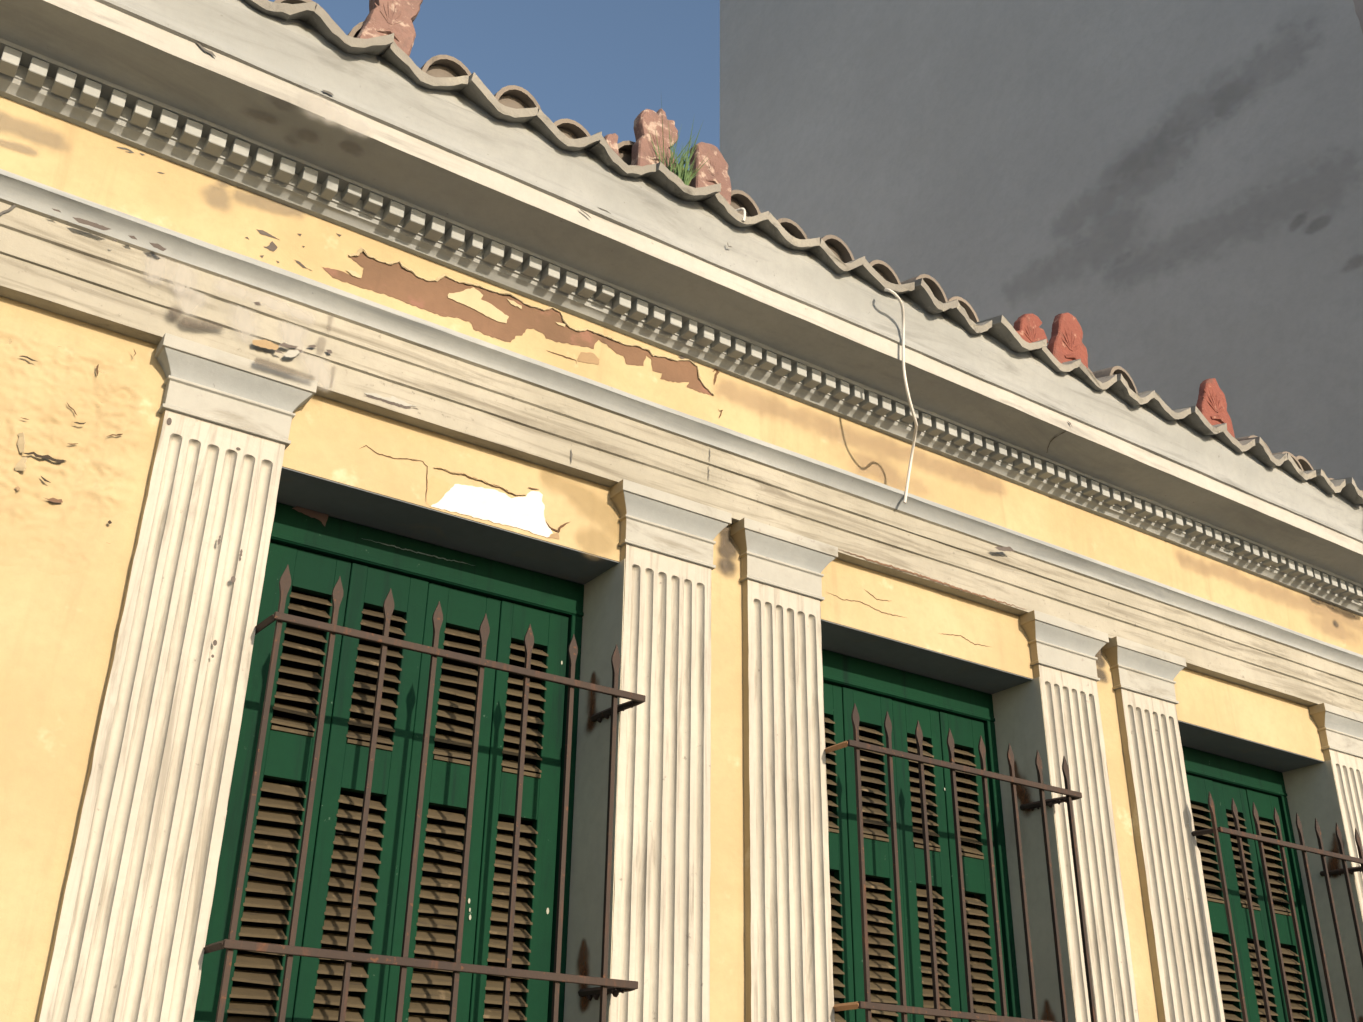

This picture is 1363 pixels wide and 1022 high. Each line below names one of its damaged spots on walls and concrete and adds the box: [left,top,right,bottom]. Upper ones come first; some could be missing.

flaking render [245,229,279,263]
spalling [252,340,332,357]
flaking render [295,234,715,396]
crack [361,445,428,502]
flaking render [426,467,569,539]
rust [578,940,589,1010]